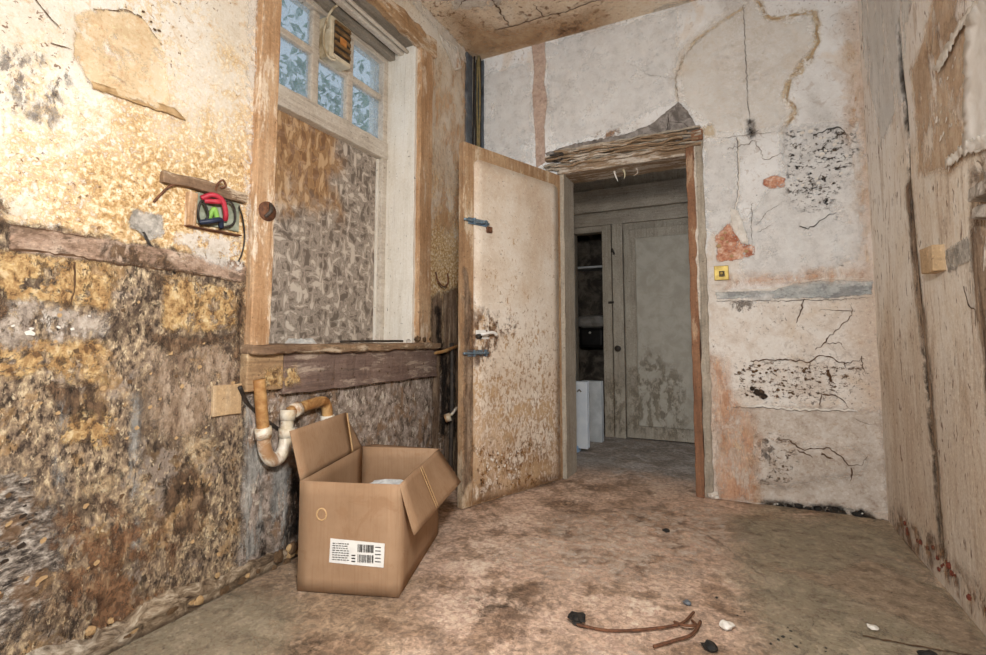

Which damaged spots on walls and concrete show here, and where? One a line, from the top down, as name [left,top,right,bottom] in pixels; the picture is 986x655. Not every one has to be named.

crack [492,0,597,31]
damp [8,55,70,127]
peeling [545,102,699,156]
flaking render [728,120,855,229]
damp [971,163,985,184]
flaking render [715,207,755,262]
peeling [0,250,112,348]
peeling [145,271,246,361]
damp [970,202,986,391]
flaking render [735,362,862,406]
peeling [0,473,65,643]